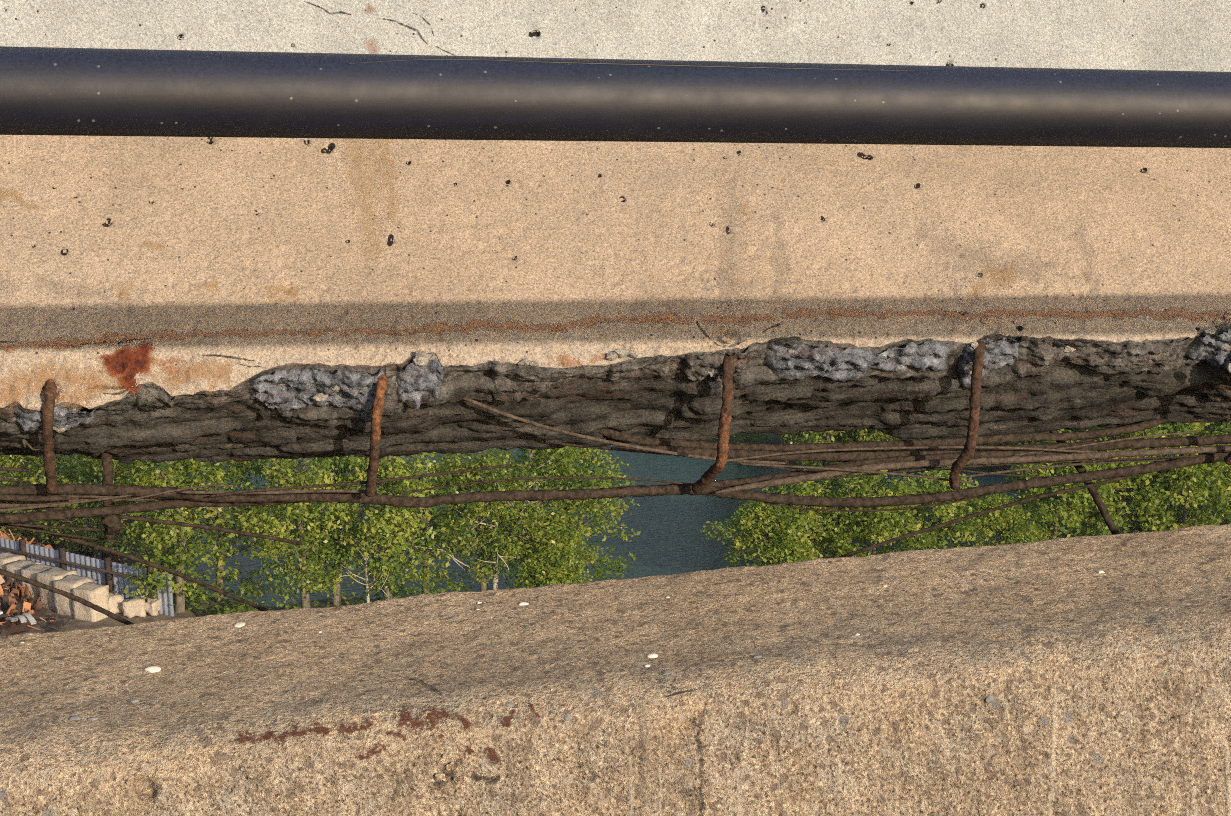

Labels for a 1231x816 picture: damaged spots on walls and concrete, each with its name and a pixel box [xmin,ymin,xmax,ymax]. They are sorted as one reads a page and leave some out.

crack [383,14,454,55]
spalling [135,379,175,412]
spalling [248,350,447,422]
spalling [488,358,552,392]
corrosion [0,308,1231,402]
spalling [606,336,751,397]
spalling [762,311,1231,388]
spalling [13,401,97,433]
corrosion [235,718,374,746]
corrosion [356,705,471,760]
corrosion [501,703,541,727]
corrosion [464,746,500,764]